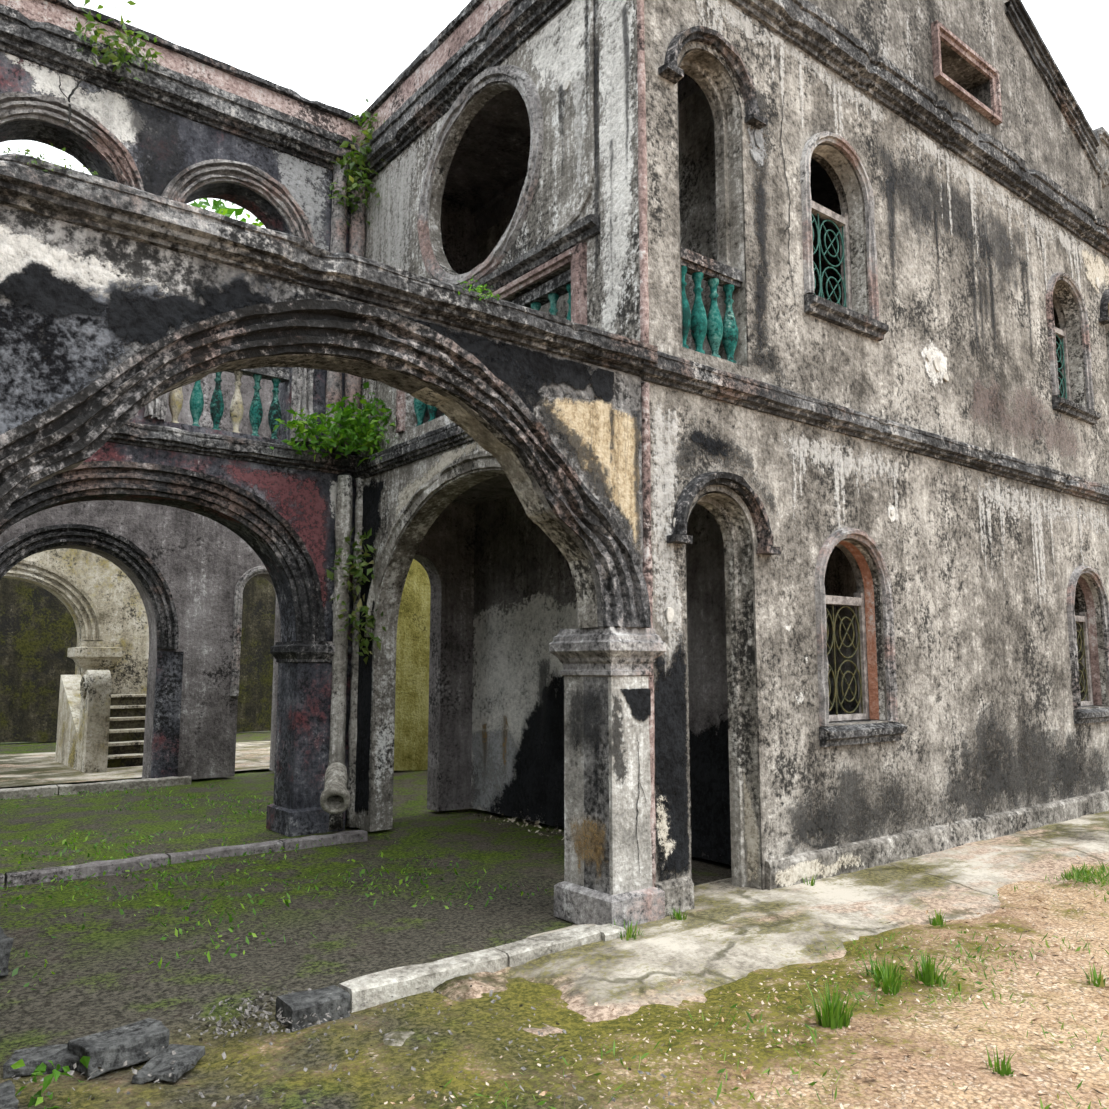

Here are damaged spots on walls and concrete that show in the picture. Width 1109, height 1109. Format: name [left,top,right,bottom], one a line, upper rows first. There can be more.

damp [584,0,599,214]
damp [0,260,275,435]
damp [385,309,641,562]
damp [674,418,776,511]
damp [781,434,899,534]
peeling [921,340,949,386]
corrosion [570,818,605,879]
damp [785,704,1109,855]